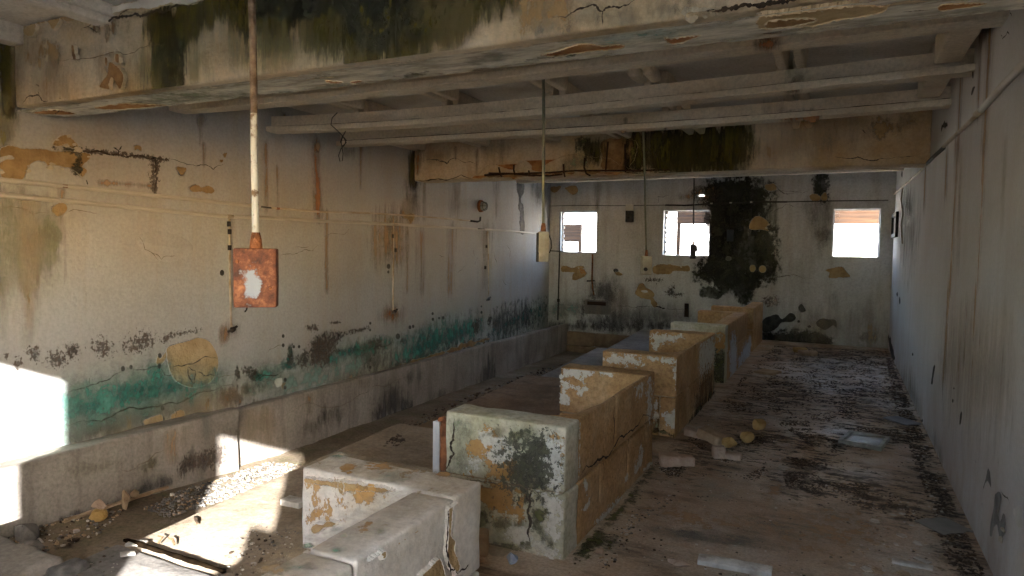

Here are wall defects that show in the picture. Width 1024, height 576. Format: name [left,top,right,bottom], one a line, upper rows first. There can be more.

damp [148,8,200,89]
damp [229,0,476,65]
peeling [18,0,1024,118]
crack [559,0,634,25]
flaking render [0,134,91,179]
crack [83,146,221,190]
damp [630,125,781,307]
damp [3,286,671,457]
peeling [559,332,687,429]
crack [445,423,455,472]
peeling [304,460,396,534]
crack [470,480,561,541]